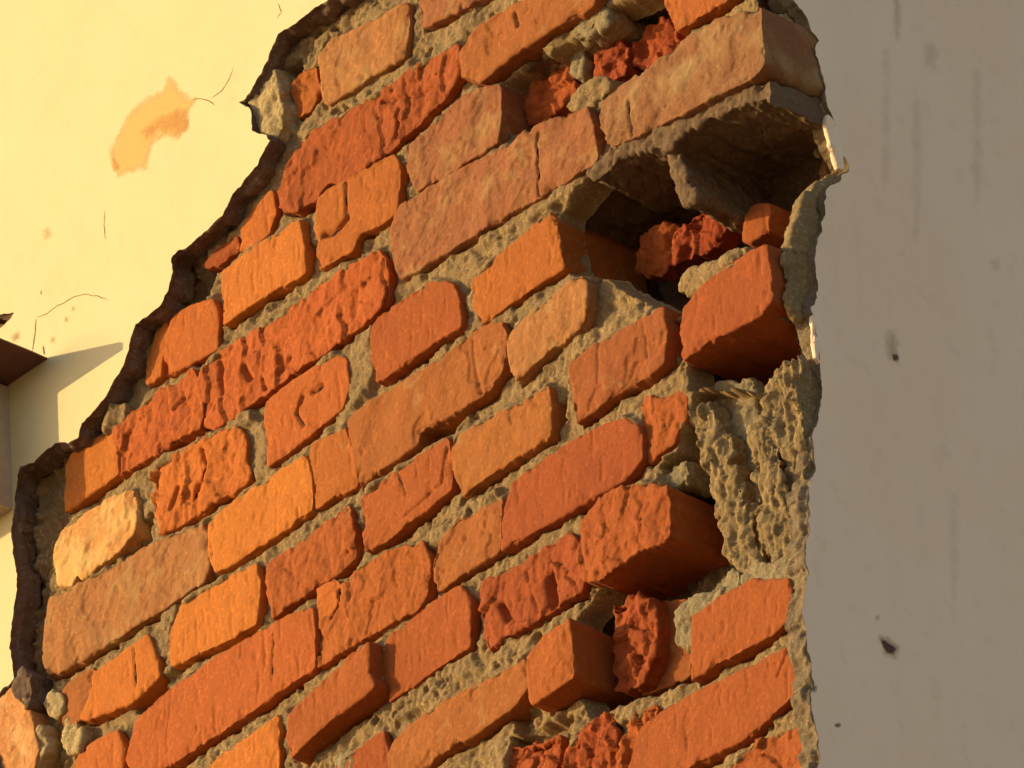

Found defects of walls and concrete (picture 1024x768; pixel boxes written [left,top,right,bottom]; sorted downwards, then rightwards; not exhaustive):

crack [32,294,107,354]
peeling [111,78,192,175]
flaking render [0,146,839,768]
flaking render [186,0,844,329]